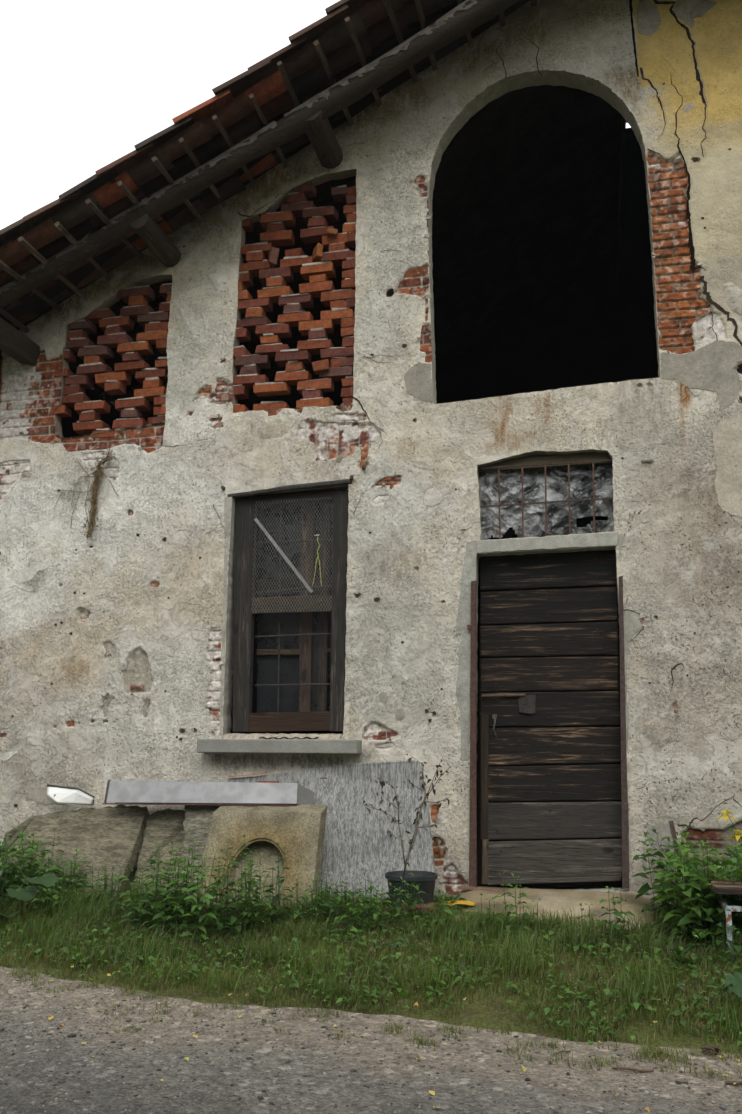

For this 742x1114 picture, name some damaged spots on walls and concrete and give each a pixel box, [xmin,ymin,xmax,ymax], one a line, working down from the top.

crack [629,0,742,366]
spalling [386,176,434,363]
spalling [646,153,725,354]
spalling [0,350,165,480]
spalling [295,403,381,468]
spalling [205,628,223,734]
flaking render [363,722,398,749]
spalling [430,804,439,822]
flaking render [432,836,469,895]